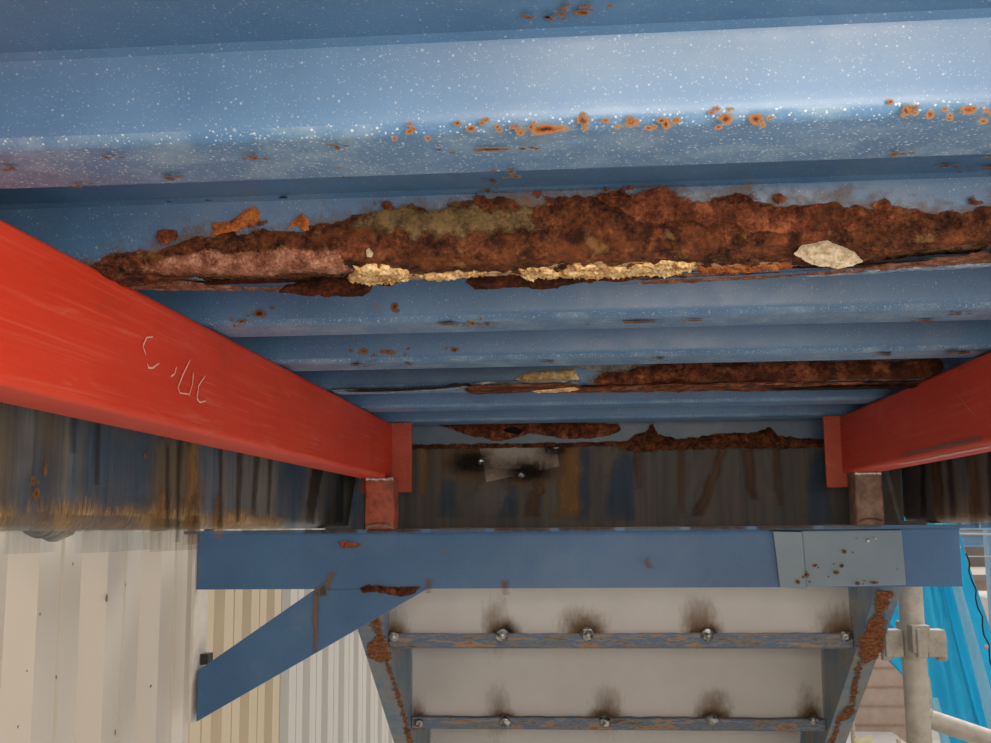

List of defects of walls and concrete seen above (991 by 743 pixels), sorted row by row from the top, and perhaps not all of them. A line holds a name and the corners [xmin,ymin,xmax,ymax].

rust [453,112,681,152]
rust [887,99,991,124]
peeling [288,213,310,231]
rust [88,170,991,287]
peeling [466,244,991,290]
rust [591,351,989,385]
leakage [86,433,197,533]
leakage [284,463,306,507]
rust [412,422,824,532]
rust [360,582,430,597]
rust [367,617,413,743]
rust [829,580,894,743]